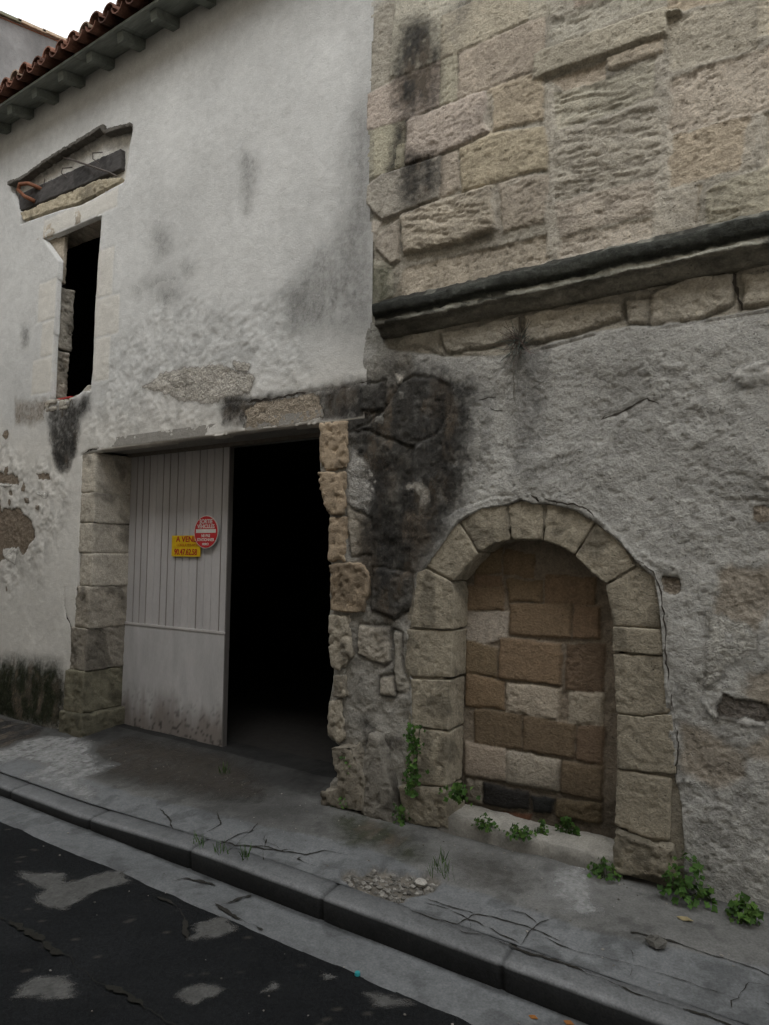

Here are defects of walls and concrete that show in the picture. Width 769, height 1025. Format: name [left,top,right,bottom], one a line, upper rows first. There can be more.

water stain [389,20,438,202]
water stain [16,397,89,469]
peeling [142,360,324,430]
water stain [222,395,278,425]
peeling [0,466,48,565]
water stain [293,363,470,626]
water stain [0,659,65,729]
spalling [699,694,769,727]
crack [411,900,769,1025]